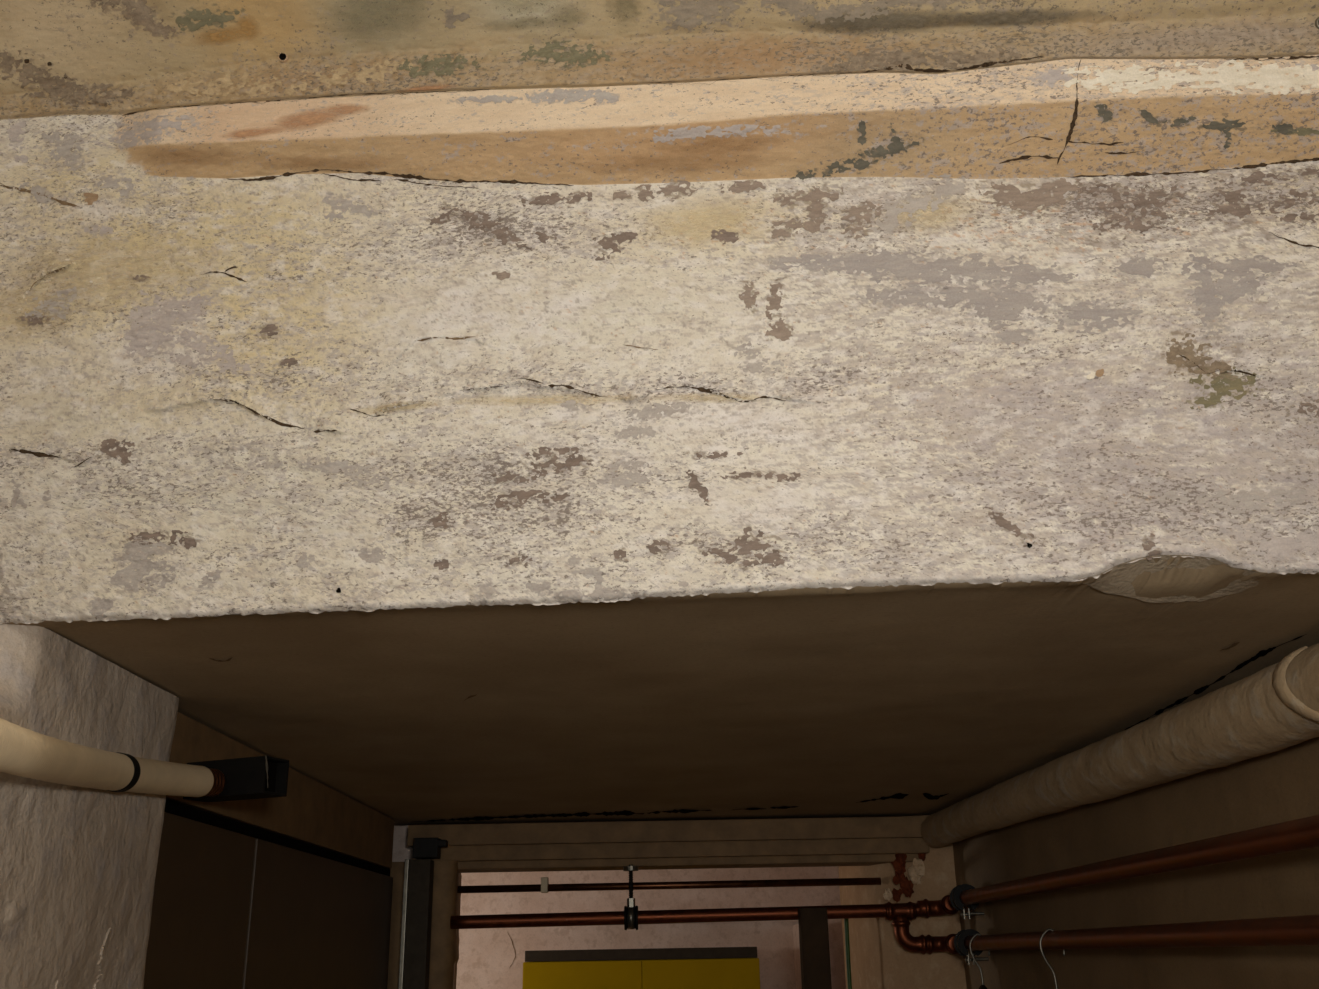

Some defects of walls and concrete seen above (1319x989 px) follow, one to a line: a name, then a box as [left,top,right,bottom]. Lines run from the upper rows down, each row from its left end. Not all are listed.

leakage [816,11,1068,33]
crack [1224,54,1319,62]
crack [999,58,1319,178]
crack [1272,233,1319,248]
crack [417,334,475,342]
crack [460,378,604,397]
crack [656,386,786,402]
crack [214,399,386,433]